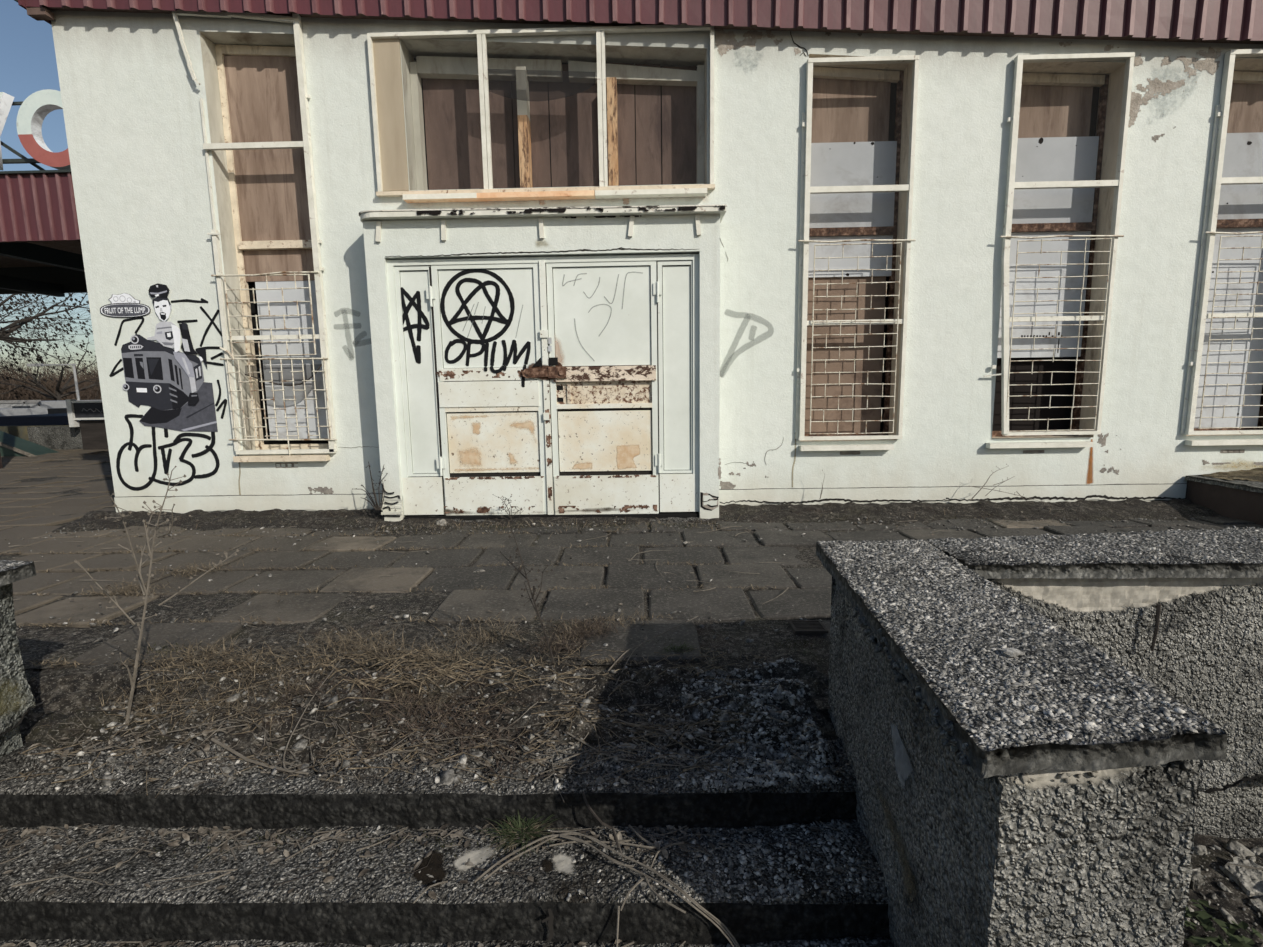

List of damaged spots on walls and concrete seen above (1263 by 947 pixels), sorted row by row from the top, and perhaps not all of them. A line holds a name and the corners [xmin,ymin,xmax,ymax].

peeling [715,29,801,57]
peeling [1128,46,1221,127]
peeling [493,206,697,218]
rust [528,343,562,380]
peeling [444,384,657,514]